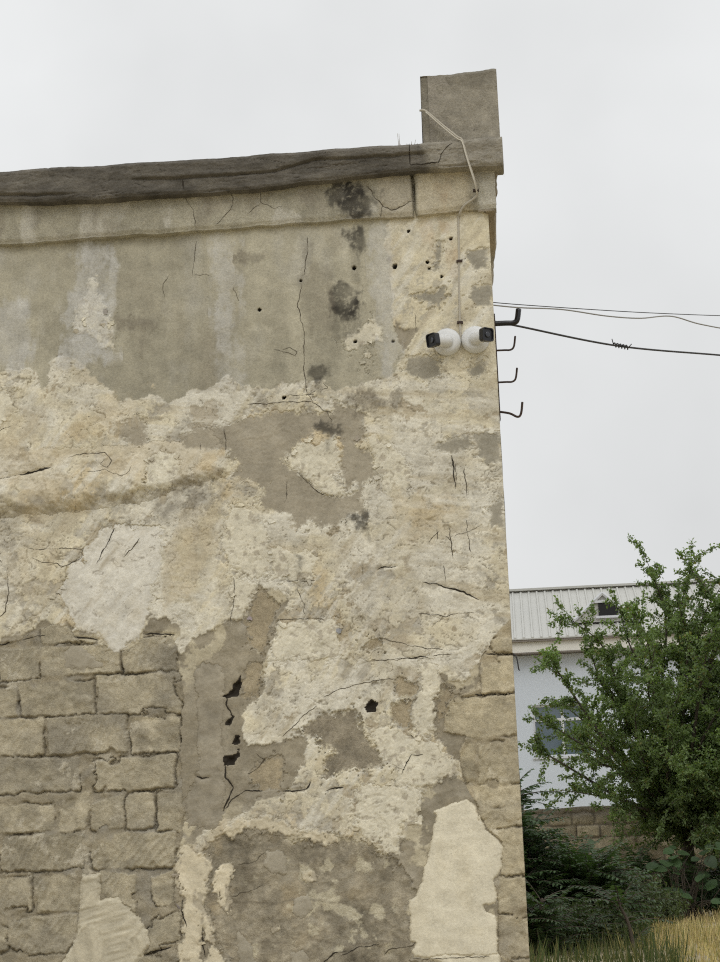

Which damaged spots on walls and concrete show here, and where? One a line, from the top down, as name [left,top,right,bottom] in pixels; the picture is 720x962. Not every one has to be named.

crack [252,238,332,422]
damp [290,179,408,455]
flaking render [431,428,502,467]
flaking render [480,496,506,530]
flaking render [120,400,414,706]
crack [279,580,324,620]
crack [419,582,479,622]
crack [283,638,449,736]
flaking render [0,521,530,962]
crack [197,754,265,811]
crack [285,782,343,792]